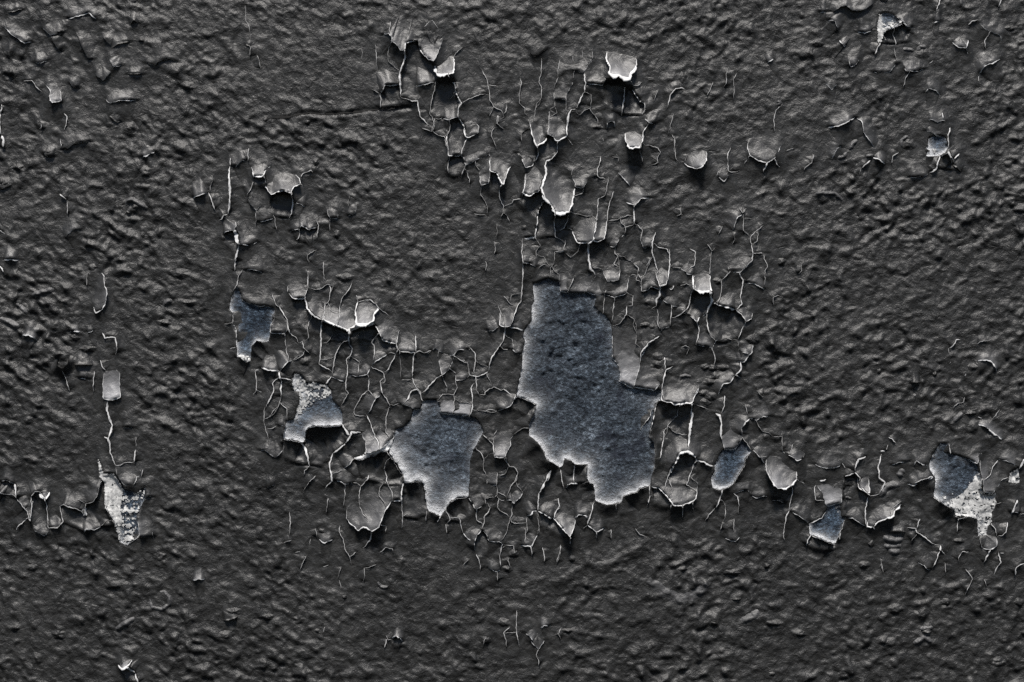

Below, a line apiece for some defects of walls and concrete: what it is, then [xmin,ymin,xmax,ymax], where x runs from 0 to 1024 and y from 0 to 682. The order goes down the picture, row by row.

crack [244,7,261,68]
crack [811,39,824,48]
crack [259,108,405,126]
crack [481,58,549,130]
crack [652,69,737,157]
crack [764,54,818,163]
crack [479,237,582,304]
flaking render [191,0,1024,589]
peeling [0,264,157,553]
crack [907,518,946,584]